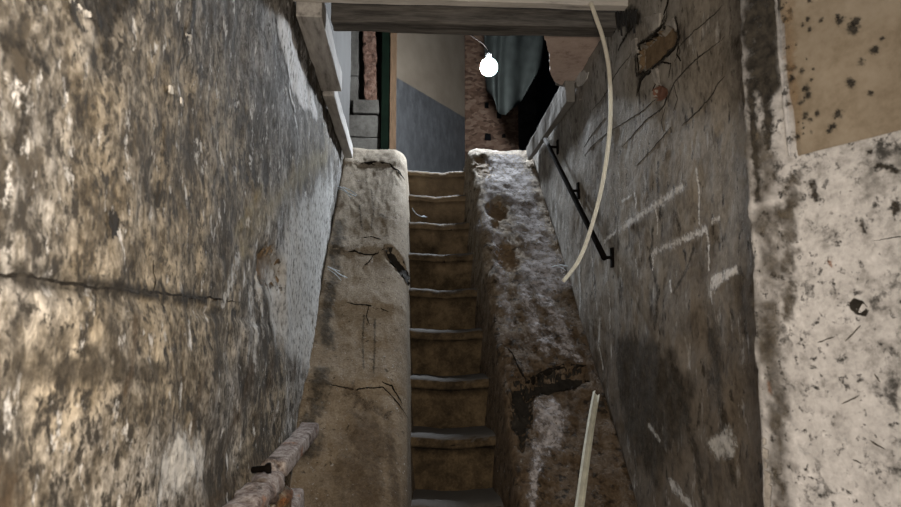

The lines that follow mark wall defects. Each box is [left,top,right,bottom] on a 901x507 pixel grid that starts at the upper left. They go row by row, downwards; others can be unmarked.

spalling [613,0,681,112]
crack [584,7,725,166]
water stain [836,14,861,34]
crack [361,161,405,180]
crack [0,272,120,291]
crack [348,236,385,265]
water stain [478,154,583,362]
water stain [604,161,738,323]
water stain [739,0,819,507]
crack [330,382,408,418]
water stain [527,399,568,507]
water stain [708,328,738,482]